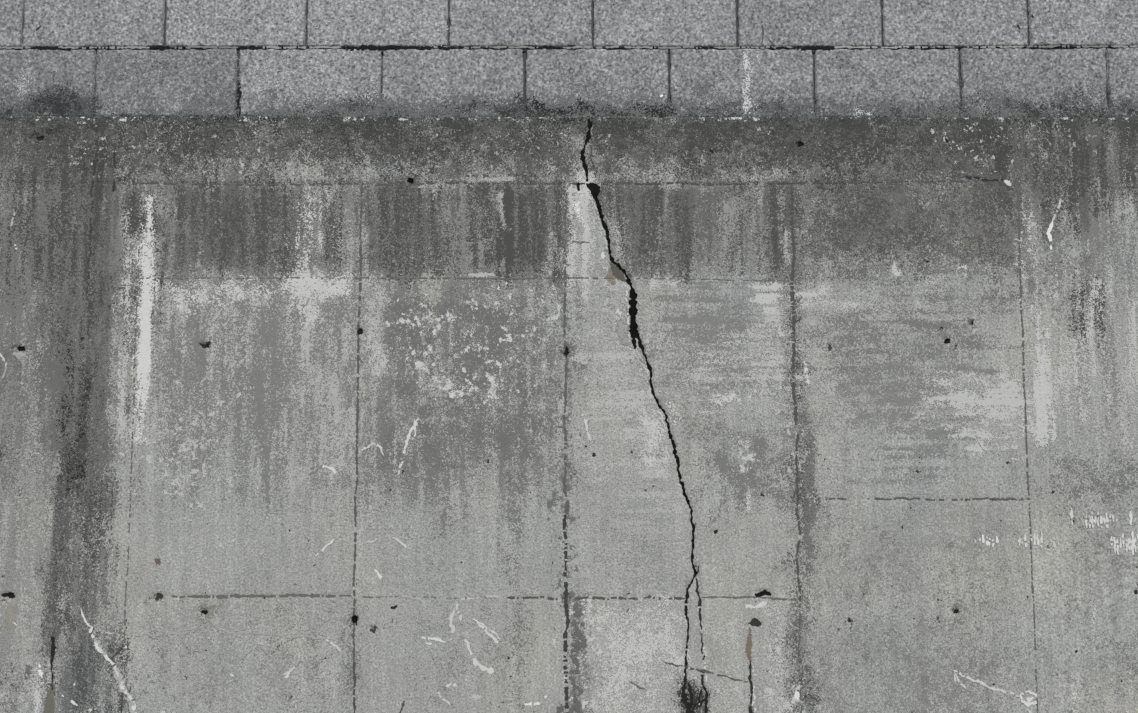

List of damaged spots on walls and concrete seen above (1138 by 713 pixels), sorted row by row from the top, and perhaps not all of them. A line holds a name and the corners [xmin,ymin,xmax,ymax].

crack [580,118,756,713]